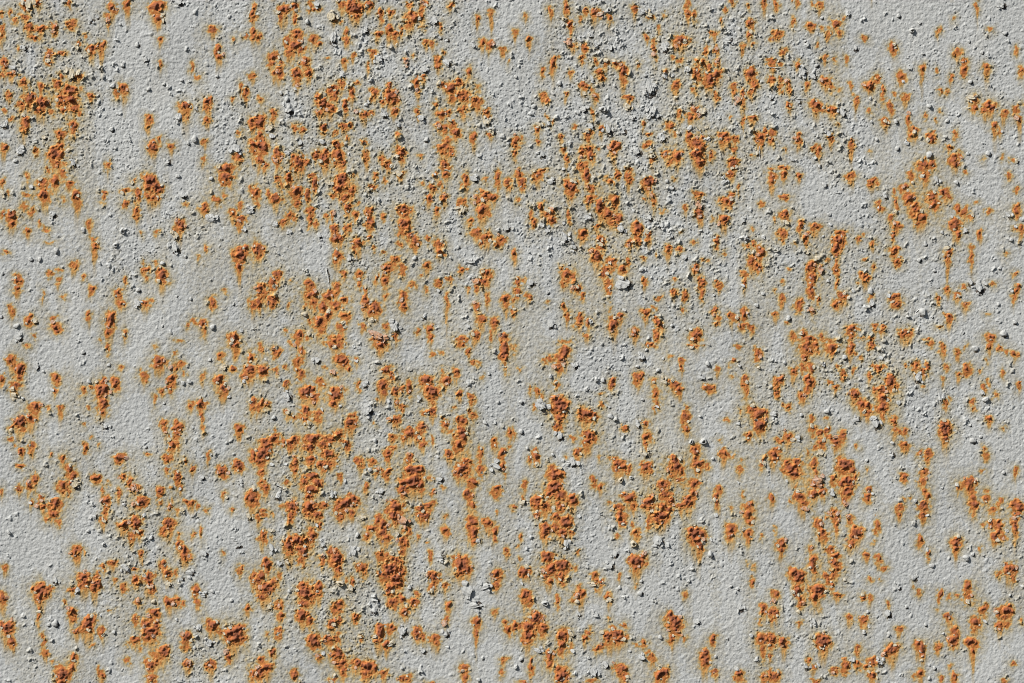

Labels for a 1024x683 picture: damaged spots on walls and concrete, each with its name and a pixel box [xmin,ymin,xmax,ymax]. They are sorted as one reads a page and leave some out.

corrosion [0,0,748,683]
corrosion [752,589,792,683]
corrosion [528,0,1024,630]
corrosion [804,443,1024,683]